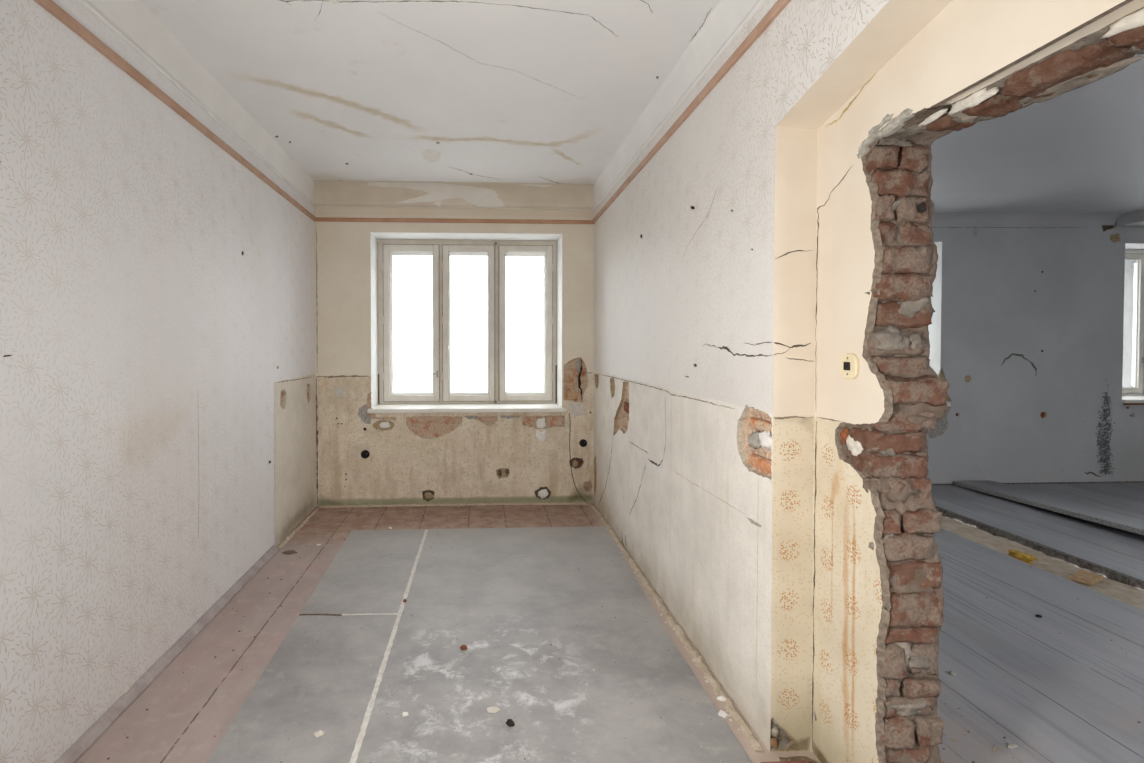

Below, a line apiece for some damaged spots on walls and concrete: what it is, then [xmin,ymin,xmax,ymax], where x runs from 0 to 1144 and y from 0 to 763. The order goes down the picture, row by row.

crack [280,0,618,95]
flaking render [925,26,1144,131]
spalling [1102,225,1120,243]
spalling [366,392,565,439]
spalling [563,357,629,436]
crack [598,441,666,547]
spalling [737,405,772,480]
flaking render [840,144,959,763]
crack [996,347,1042,376]
leakage [1096,392,1115,475]